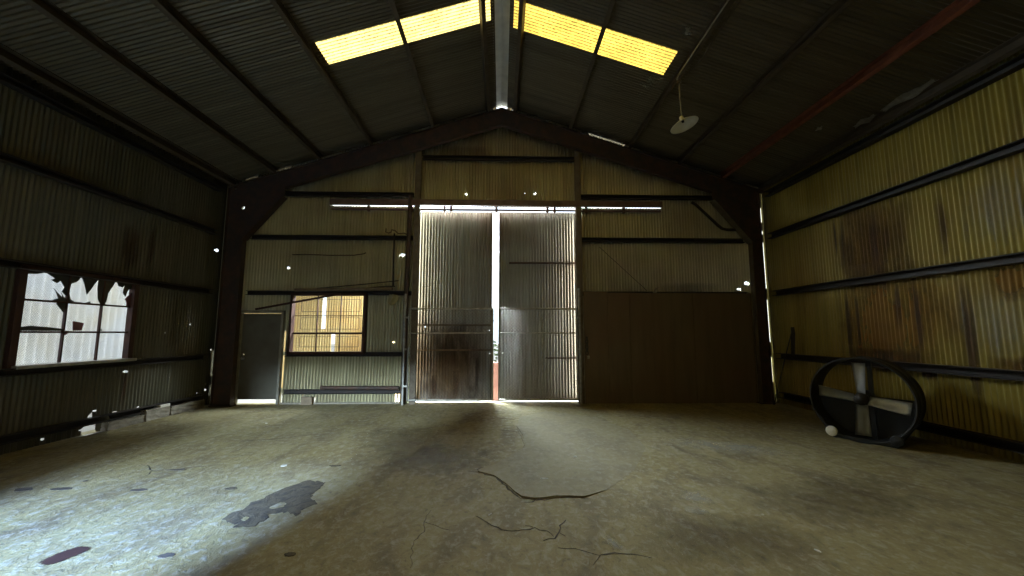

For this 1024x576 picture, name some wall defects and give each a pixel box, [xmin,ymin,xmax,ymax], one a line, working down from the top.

corrosion [962,309,978,388]
crack [471,467,651,565]